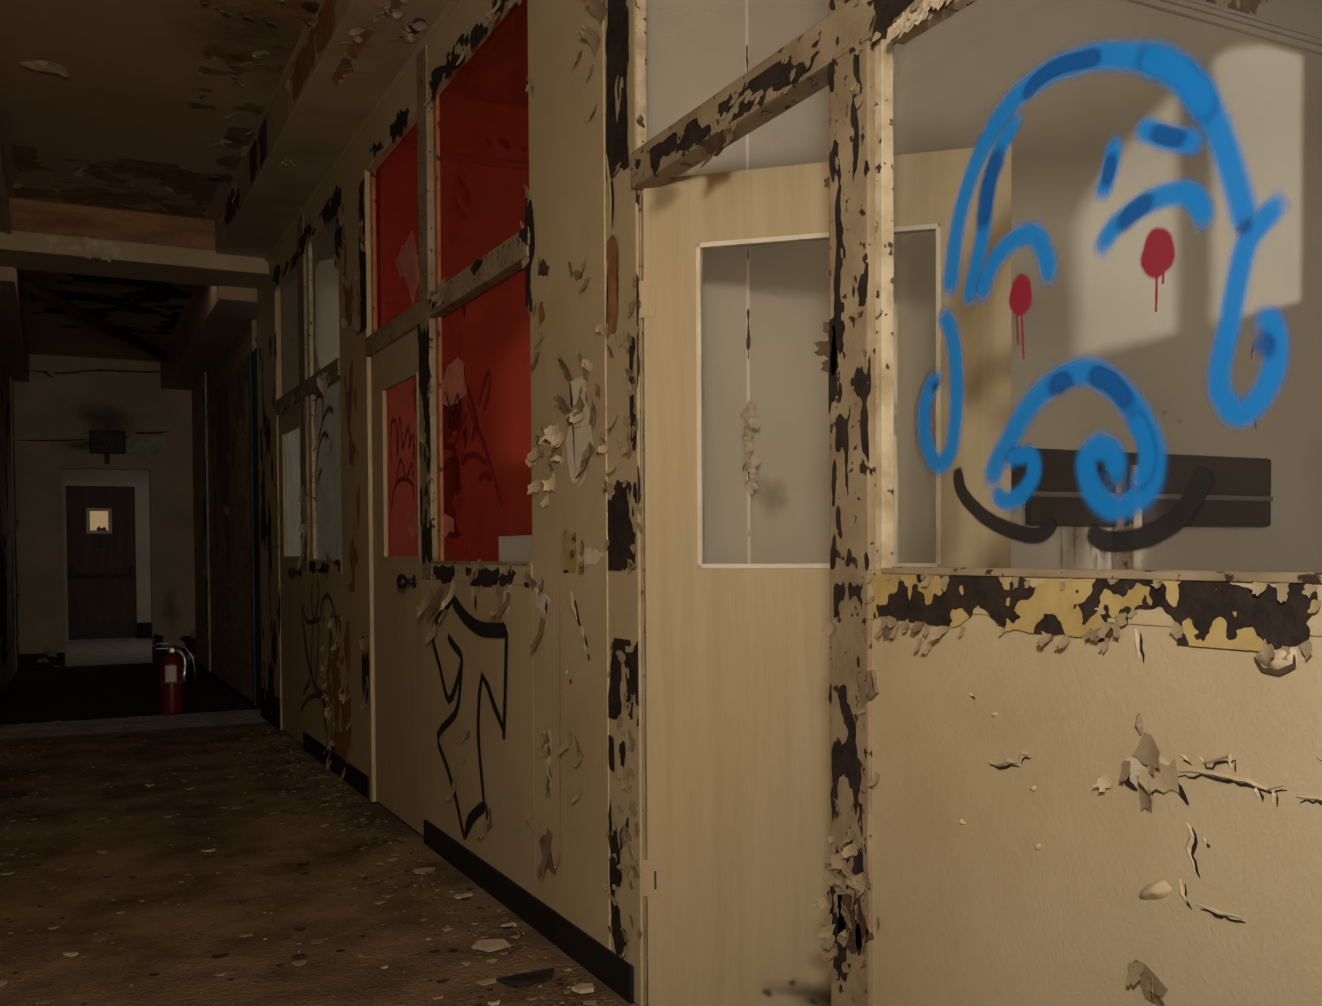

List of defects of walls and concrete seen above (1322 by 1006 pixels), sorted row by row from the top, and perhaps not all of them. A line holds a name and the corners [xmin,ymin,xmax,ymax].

peeling [10,117,267,239]
peeling [268,0,522,337]
peeling [518,183,550,370]
peeling [525,231,643,574]
peeling [572,0,1322,660]
peeling [602,638,642,959]
peeling [811,648,880,982]
peeling [1092,732,1189,812]
peeling [1126,959,1168,1006]